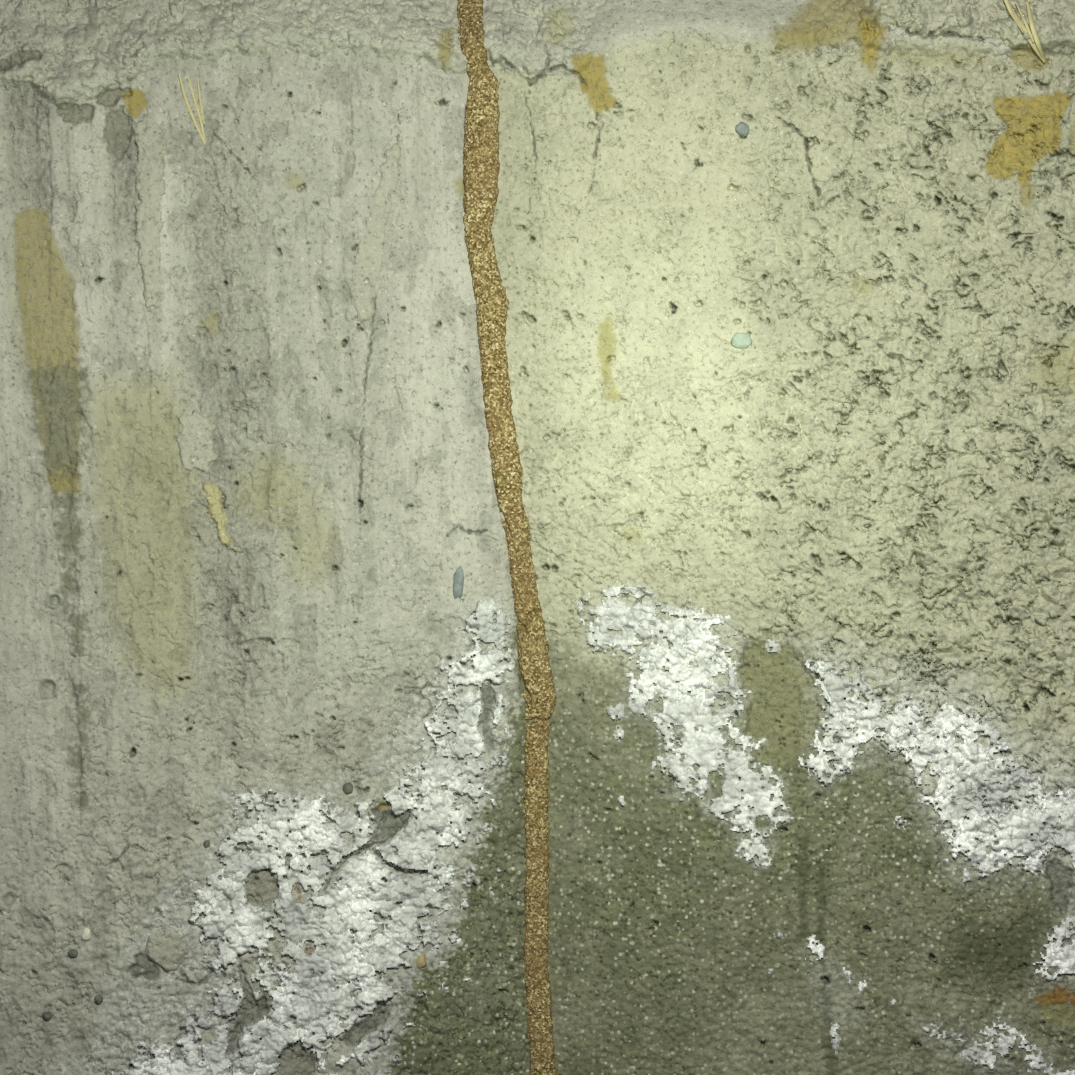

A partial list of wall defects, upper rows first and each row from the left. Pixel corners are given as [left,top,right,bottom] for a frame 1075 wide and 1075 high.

damp [16,210,90,653]
damp [48,599,533,1075]
damp [546,583,1075,1075]